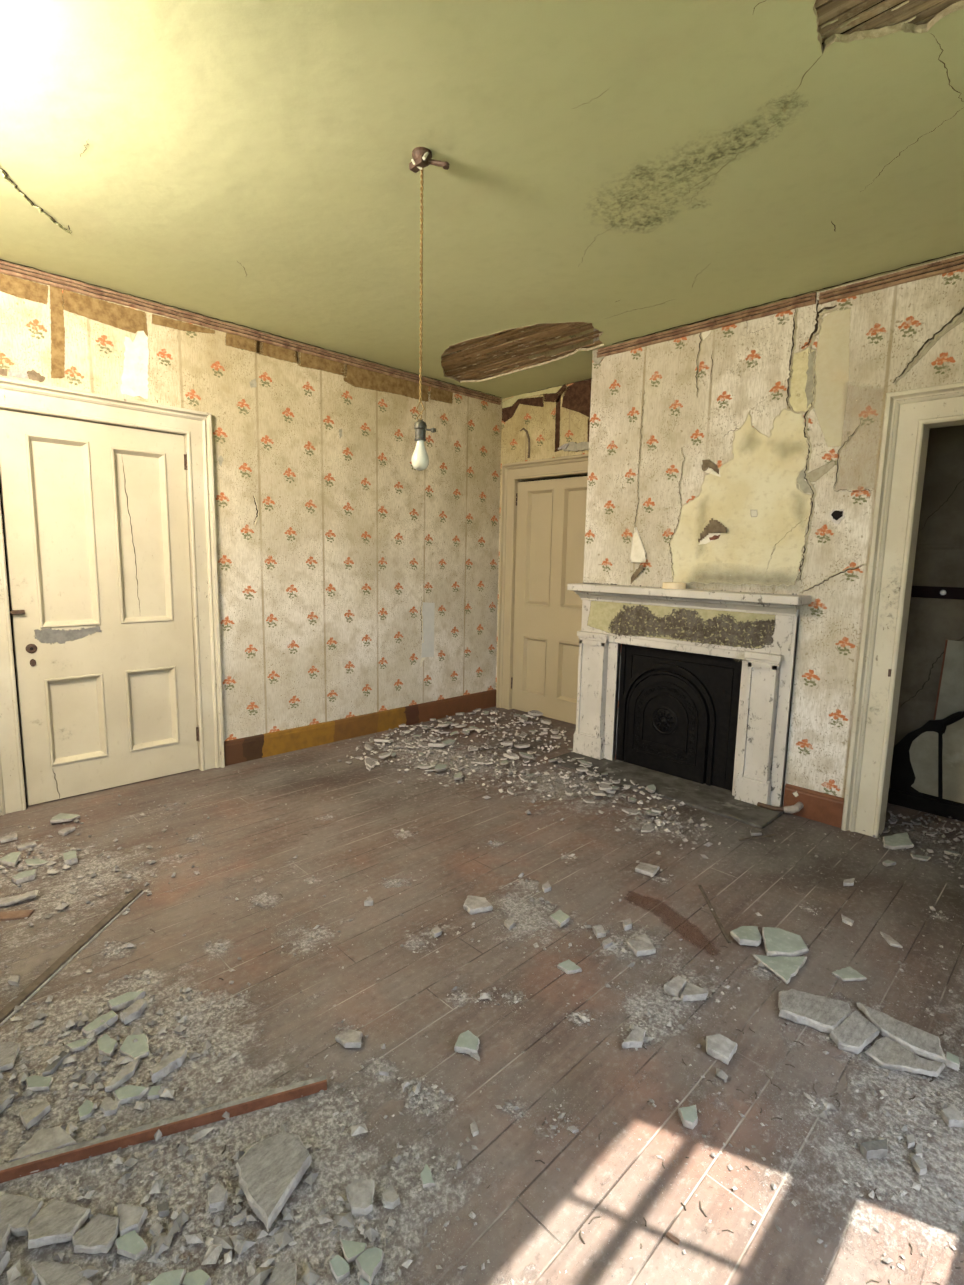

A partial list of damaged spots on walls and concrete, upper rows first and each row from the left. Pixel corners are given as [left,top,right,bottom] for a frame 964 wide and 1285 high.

crack [860,33,964,192]
crack [0,168,72,234]
peeling [0,273,453,404]
spalling [788,347,816,413]
crack [610,252,964,593]
spalling [796,470,815,494]
peeling [587,601,775,649]